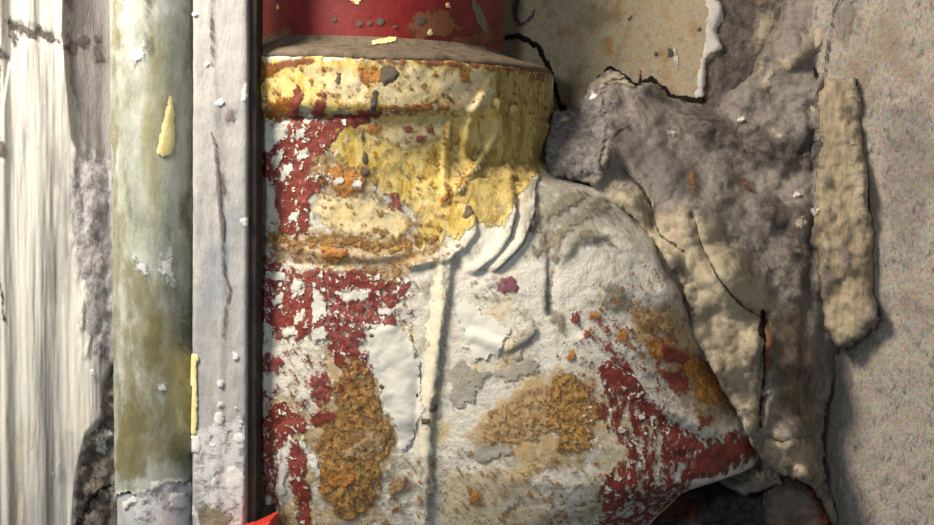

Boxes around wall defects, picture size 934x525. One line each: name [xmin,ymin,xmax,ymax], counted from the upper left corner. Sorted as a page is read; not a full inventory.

peeling [262,65,400,241]
crack [505,33,567,111]
crack [597,66,706,104]
peeling [0,0,117,525]
leakage [115,388,144,479]
peeling [262,370,337,525]
peeling [262,255,437,450]
rust [262,349,677,525]
peeling [457,299,511,363]
rust [589,259,739,425]
peeling [603,337,755,478]
crack [599,124,812,443]